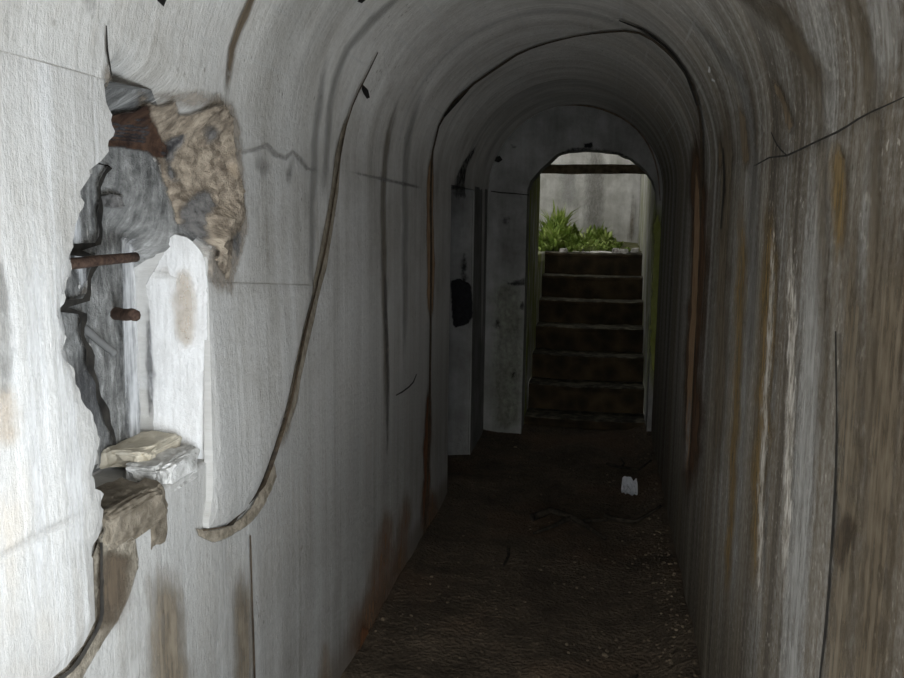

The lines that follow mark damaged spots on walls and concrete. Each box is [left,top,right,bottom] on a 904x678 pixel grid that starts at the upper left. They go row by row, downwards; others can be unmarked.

spalling [53,69,247,678]
crack [203,20,703,536]
water stain [713,108,750,455]
water stain [747,0,826,393]
crack [754,97,904,166]
water stain [819,0,904,678]